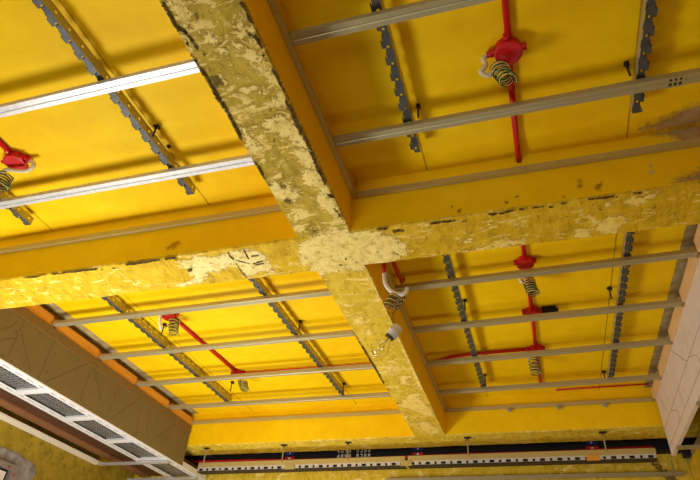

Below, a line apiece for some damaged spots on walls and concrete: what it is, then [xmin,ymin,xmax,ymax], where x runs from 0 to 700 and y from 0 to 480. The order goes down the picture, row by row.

peeling [125,248,278,287]
peeling [160,0,410,317]